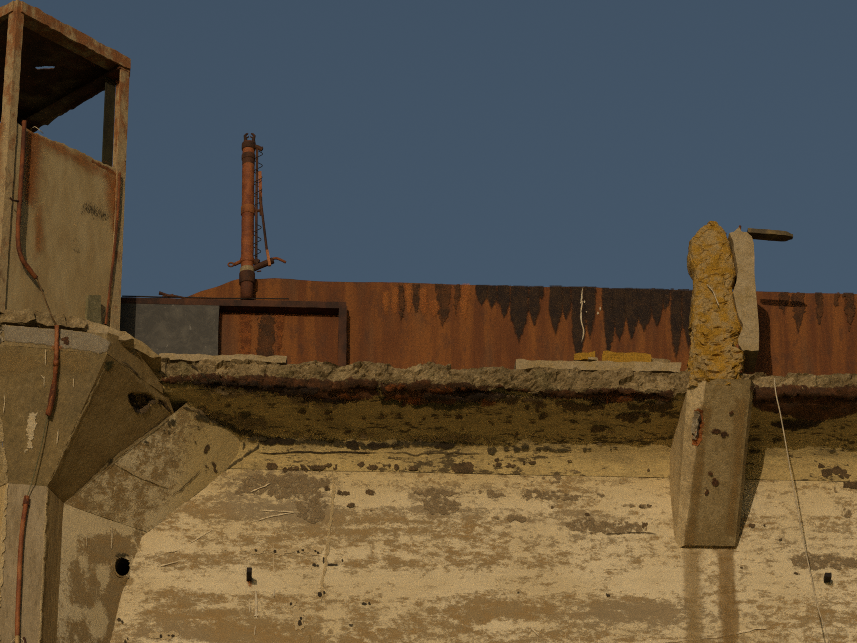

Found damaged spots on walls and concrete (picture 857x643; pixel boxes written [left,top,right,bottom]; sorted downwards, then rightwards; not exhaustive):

corrosion [26,130,116,211]
corrosion [383,283,470,326]
corrosion [239,312,285,357]
spalling [157,357,690,398]
spalling [736,344,857,401]
spalling [128,394,172,414]
spalling [0,417,8,606]
crack [619,628,768,643]